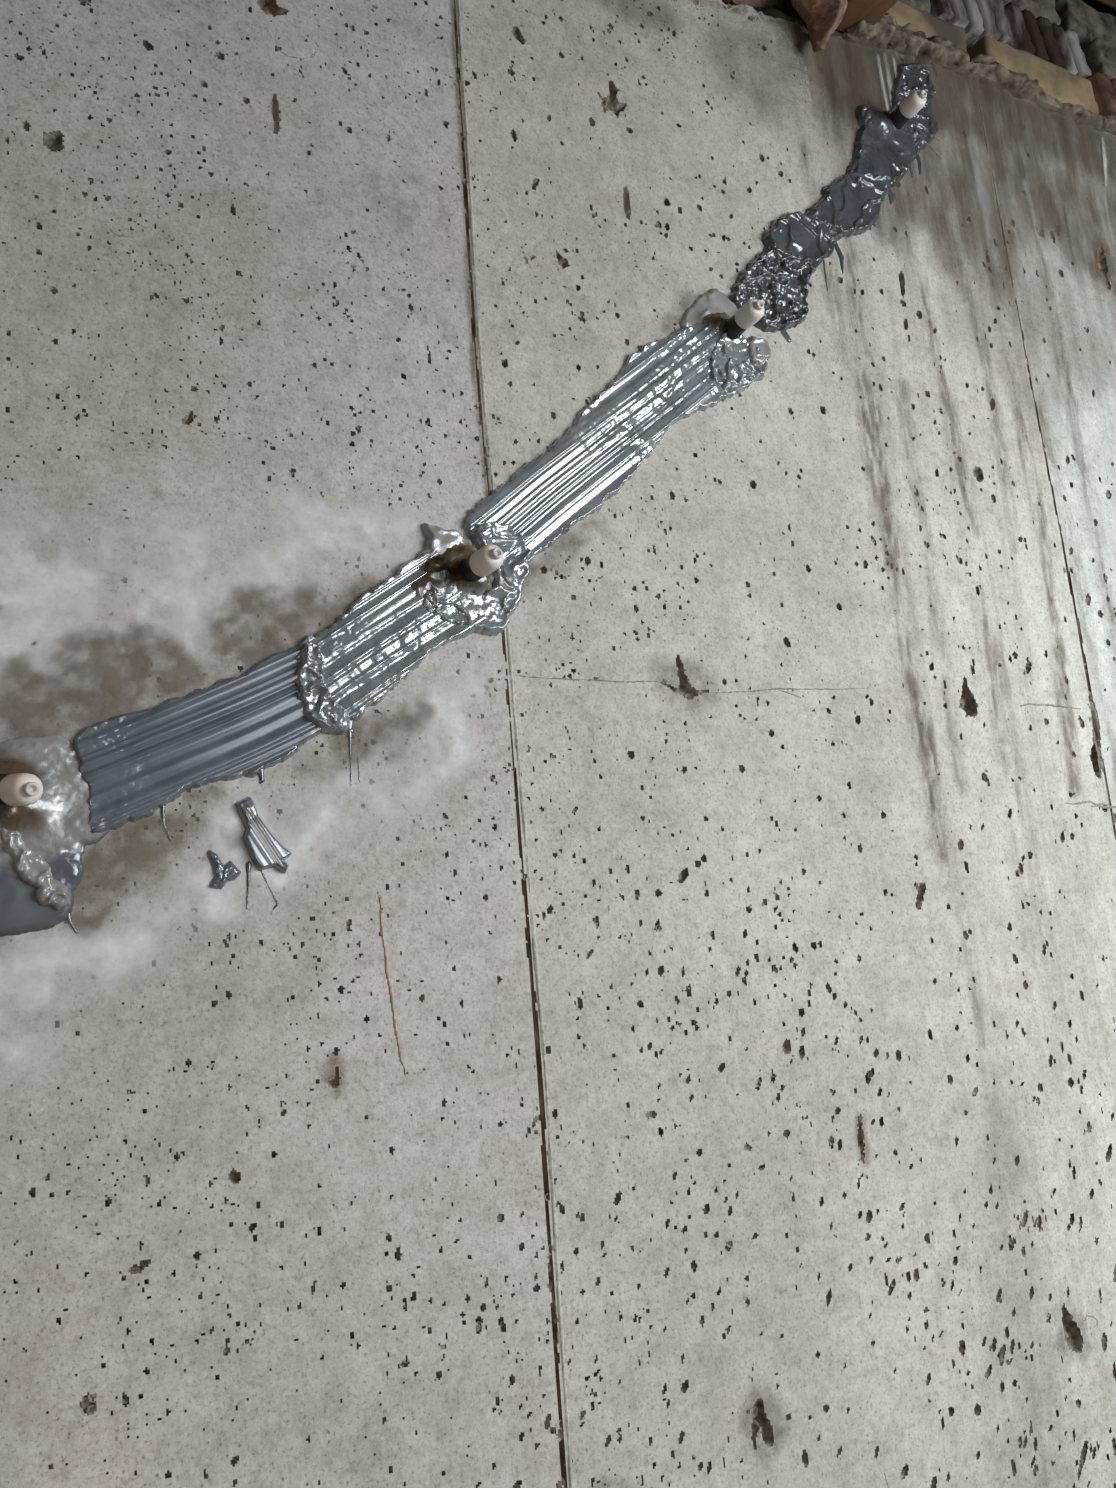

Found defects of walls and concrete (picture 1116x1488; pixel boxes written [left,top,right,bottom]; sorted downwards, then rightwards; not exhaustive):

damp [791,22,1116,273]
crack [0,45,940,937]
damp [863,403,899,580]
damp [0,502,403,738]
damp [336,689,470,785]
damp [908,652,938,768]
damp [1057,640,1078,790]
damp [0,816,188,1008]
damp [187,799,336,921]